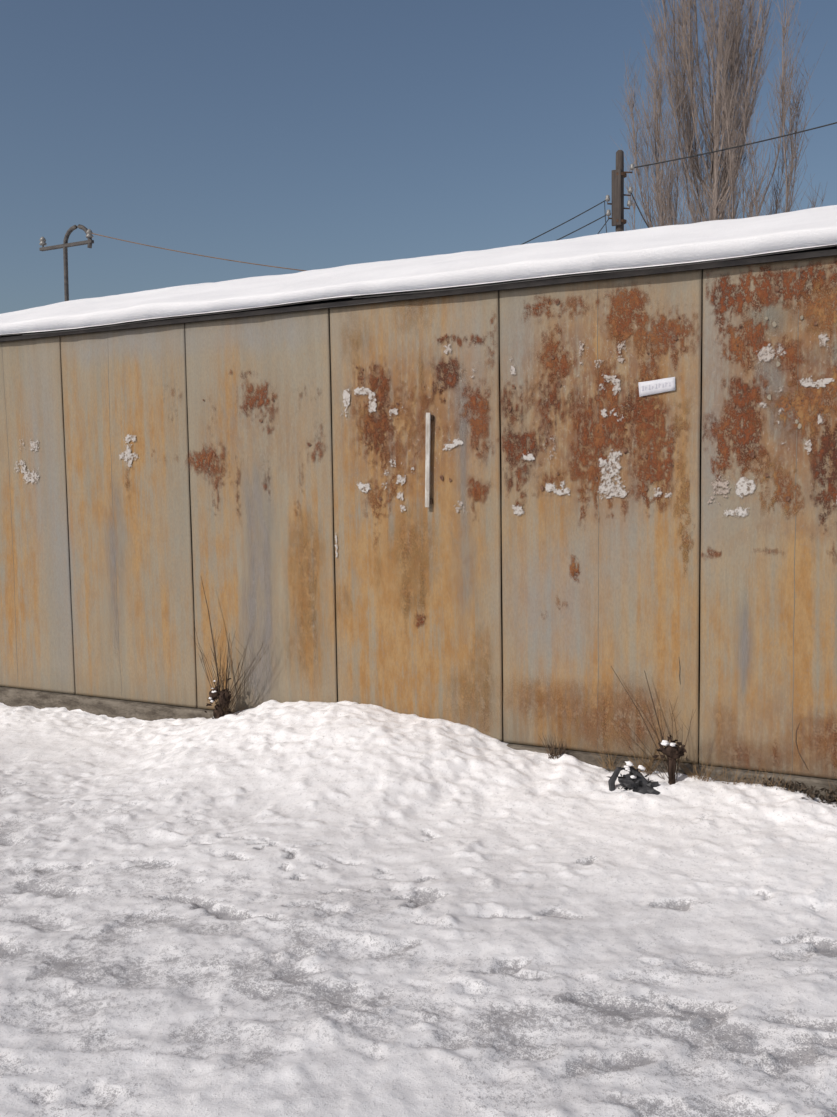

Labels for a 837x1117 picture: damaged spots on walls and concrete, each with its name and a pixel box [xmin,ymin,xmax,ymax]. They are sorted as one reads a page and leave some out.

rust [188,448,225,485]
rust [230,371,276,434]
rust [355,288,721,571]
rust [704,261,837,521]